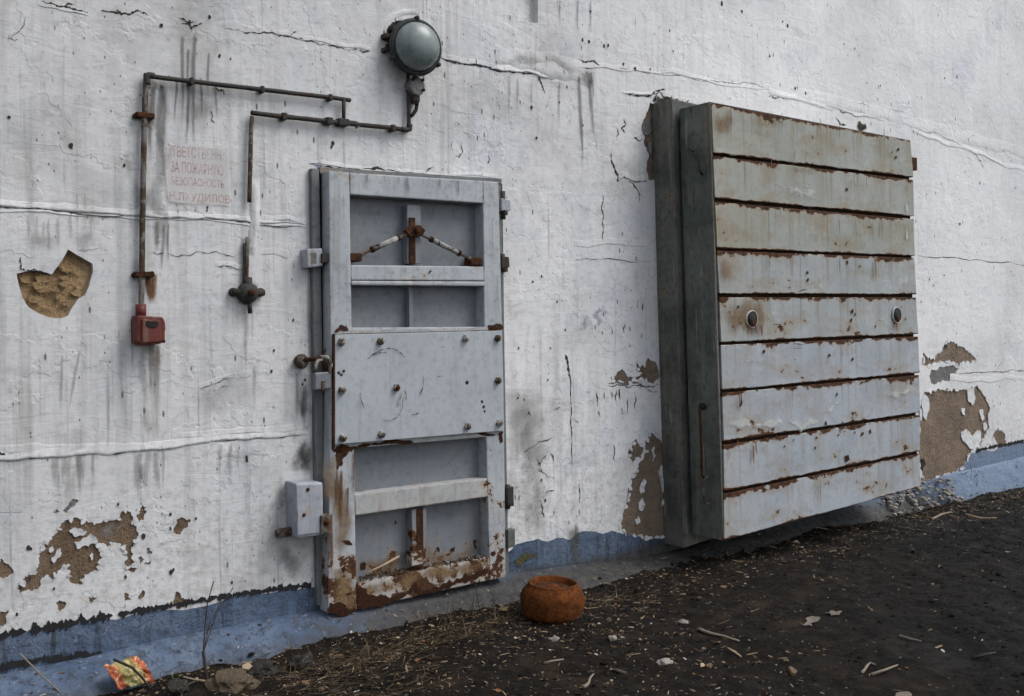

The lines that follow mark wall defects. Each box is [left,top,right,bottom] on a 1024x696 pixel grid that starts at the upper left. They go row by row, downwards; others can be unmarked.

crack [4,1,148,41]
crack [442,54,785,99]
crack [825,103,984,168]
flaking render [17,250,91,318]
peeling [923,332,977,368]
peeling [596,358,660,417]
peeling [917,381,1006,481]
peeling [618,431,665,541]
peeling [0,499,152,611]
corrosion [327,551,496,617]